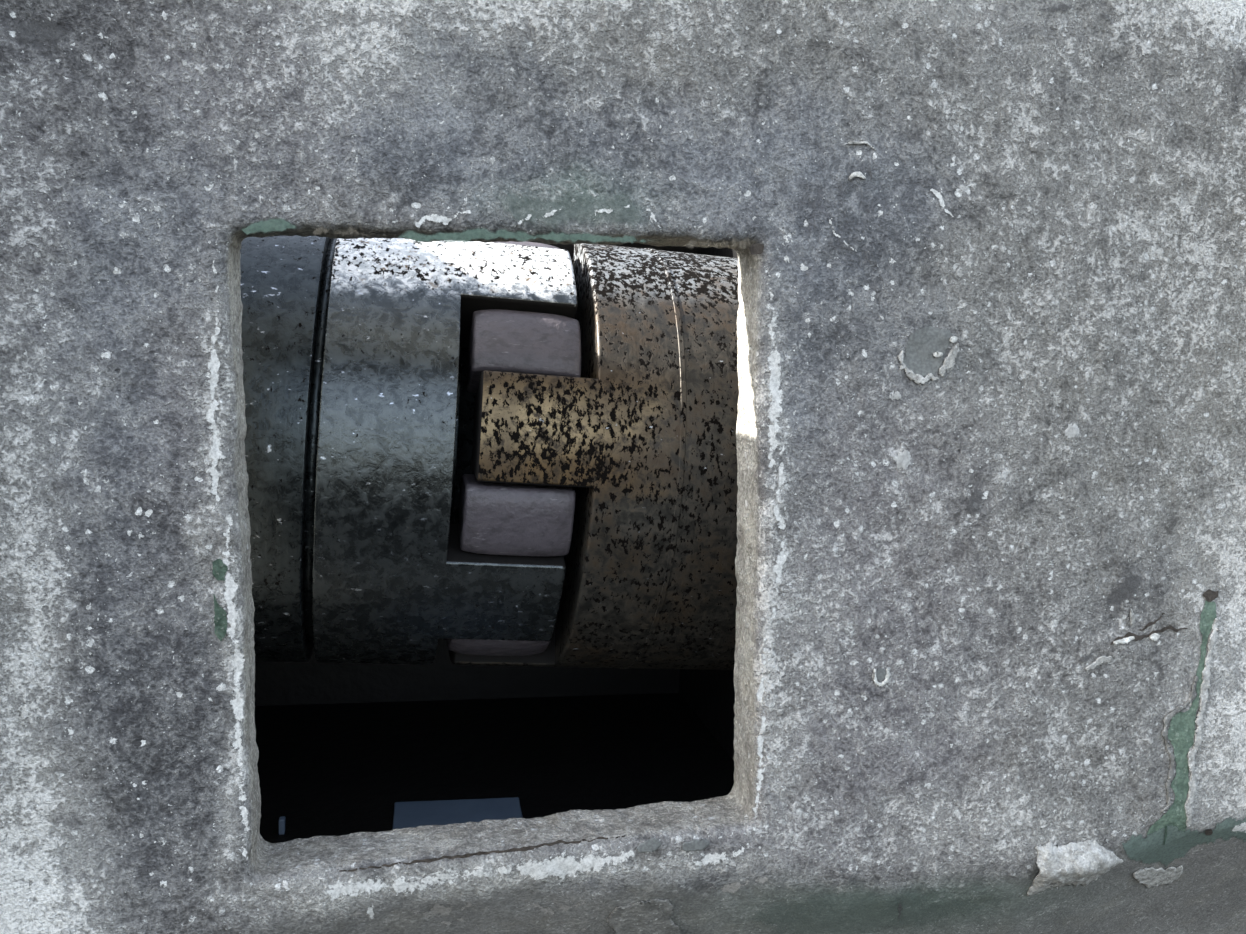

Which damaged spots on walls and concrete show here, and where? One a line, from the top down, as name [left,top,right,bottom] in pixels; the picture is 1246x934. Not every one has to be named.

peeling [898,326,959,384]
crack [1072,609,1188,671]
peeling [1027,589,1246,896]